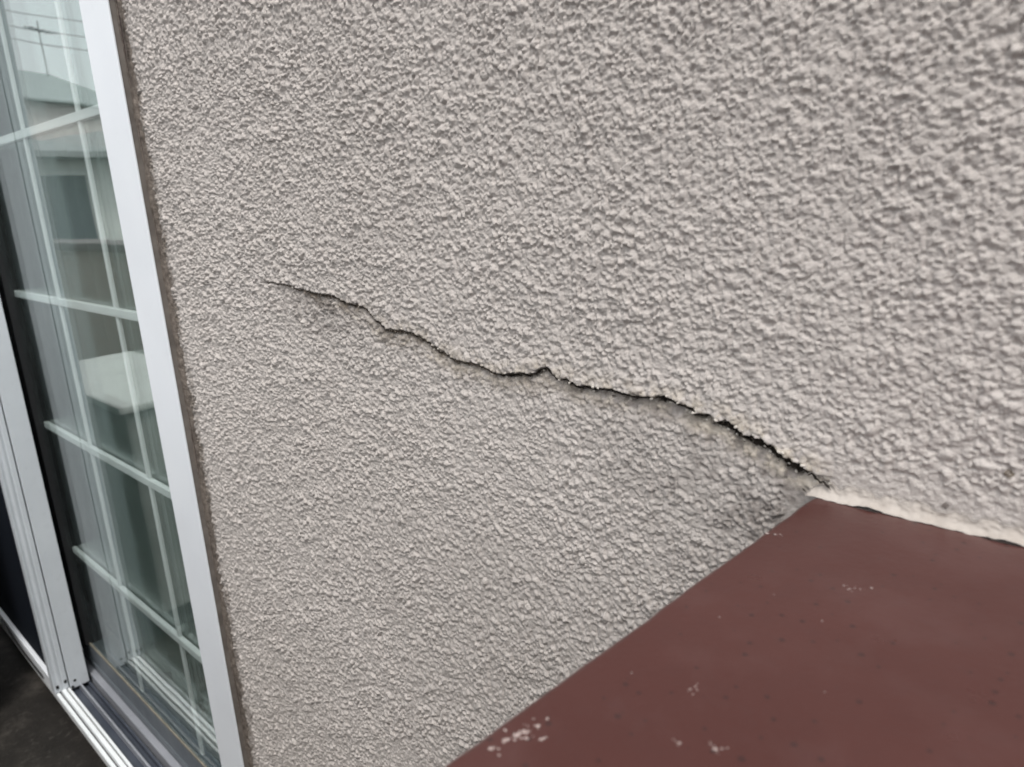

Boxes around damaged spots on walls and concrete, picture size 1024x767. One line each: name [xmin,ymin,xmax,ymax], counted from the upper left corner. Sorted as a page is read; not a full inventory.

crack [264,282,831,493]